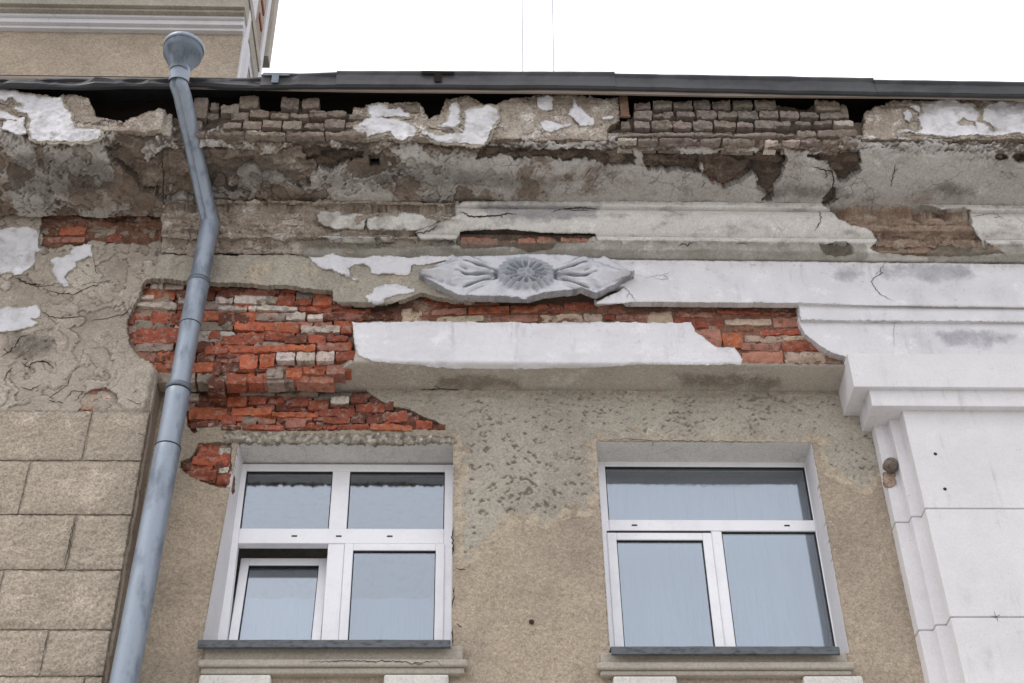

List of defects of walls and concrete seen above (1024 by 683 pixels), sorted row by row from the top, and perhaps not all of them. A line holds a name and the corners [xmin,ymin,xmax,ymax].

peeling [0,89,184,196]
flaking render [194,95,502,151]
flaking render [537,95,862,156]
peeling [895,99,1024,141]
crack [462,211,511,219]
crack [812,166,835,228]
flaking render [821,187,836,203]
flaking render [0,215,162,292]
crack [17,260,133,322]
flaking render [128,282,187,393]
crack [0,335,83,403]
flaking render [181,229,897,569]